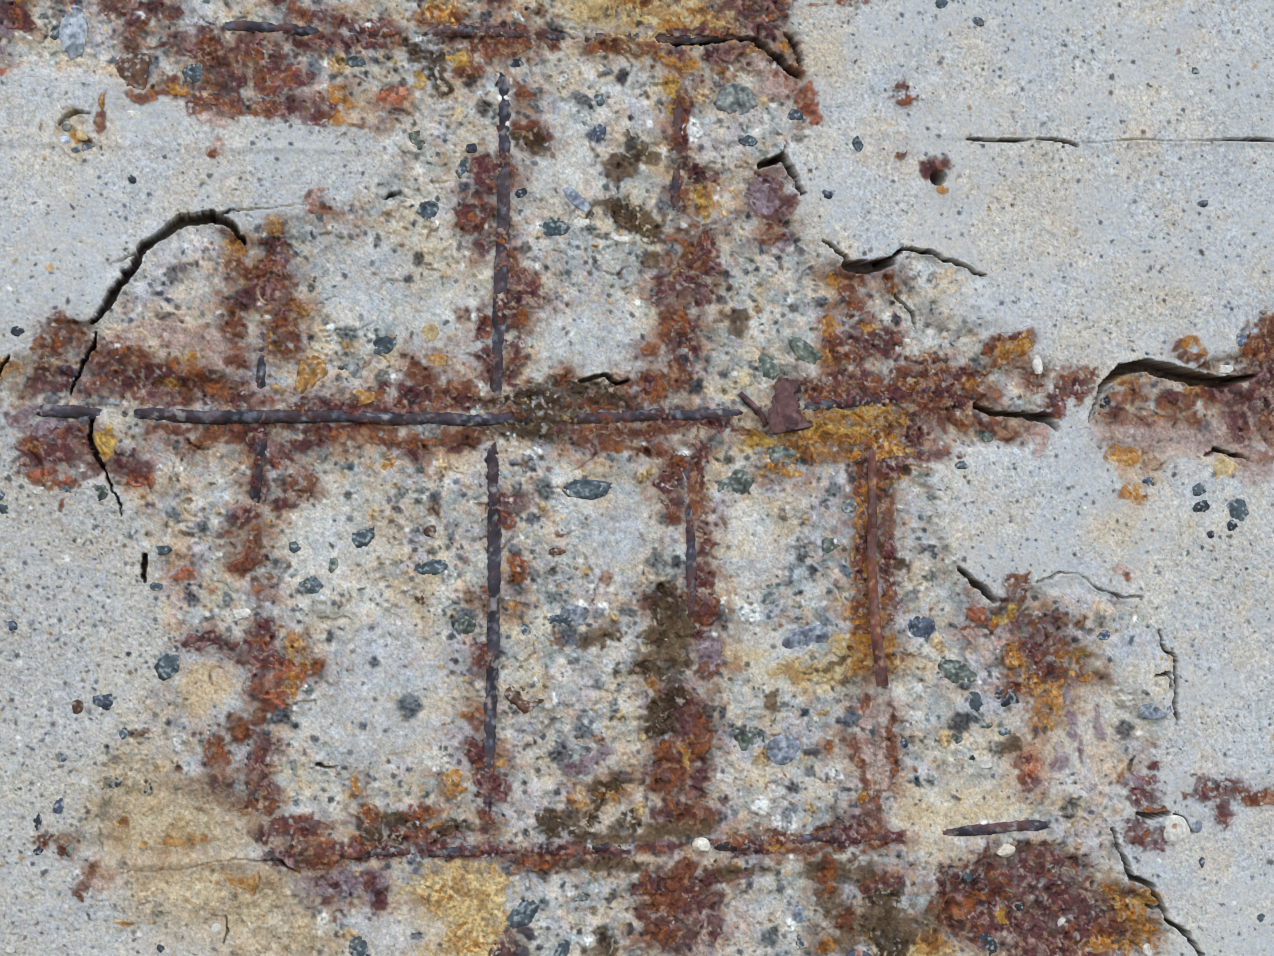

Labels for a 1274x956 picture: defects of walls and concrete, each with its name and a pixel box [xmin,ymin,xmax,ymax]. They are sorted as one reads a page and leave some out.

crack [71,203,305,395]
corrosion [0,152,541,597]
crack [822,239,983,277]
corrosion [552,0,1274,681]
crack [1092,359,1247,405]
spalling [1088,311,1274,539]
spalling [232,608,251,619]
spalling [72,699,84,714]
spalling [93,693,113,711]
corrosion [178,607,906,956]
corrosion [913,836,1167,956]
crack [1110,811,1203,956]